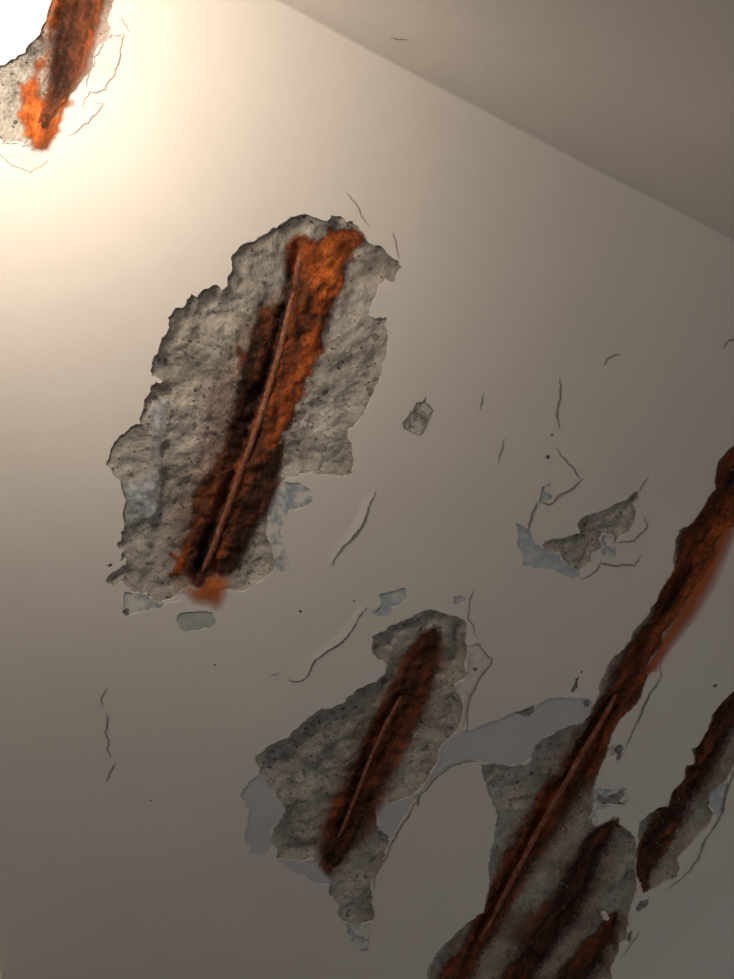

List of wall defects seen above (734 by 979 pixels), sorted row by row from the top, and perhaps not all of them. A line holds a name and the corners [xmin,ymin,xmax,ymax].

spalling [0,0,123,172]
spalling [106,214,402,632]
peeling [404,398,432,433]
crack [526,378,584,533]
corrosion [191,575,224,604]
crack [581,519,648,579]
spalling [240,588,478,951]
spalling [427,446,734,979]